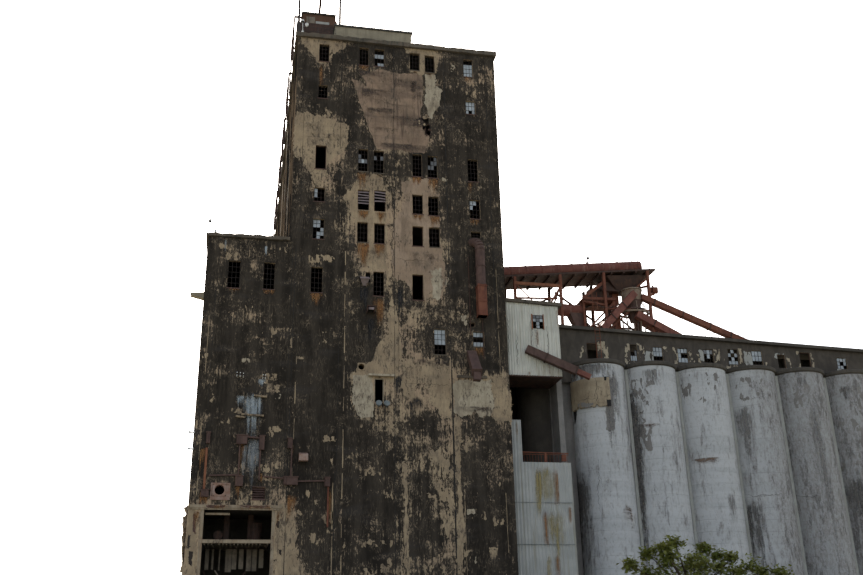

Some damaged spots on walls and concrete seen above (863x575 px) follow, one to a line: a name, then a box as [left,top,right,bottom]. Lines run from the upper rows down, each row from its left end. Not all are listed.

peeling [286,109,349,186]
peeling [352,48,442,153]
peeling [343,297,512,575]
peeling [625,344,753,453]
peeling [180,506,197,575]
corrosion [536,469,571,575]
damp [747,506,767,566]